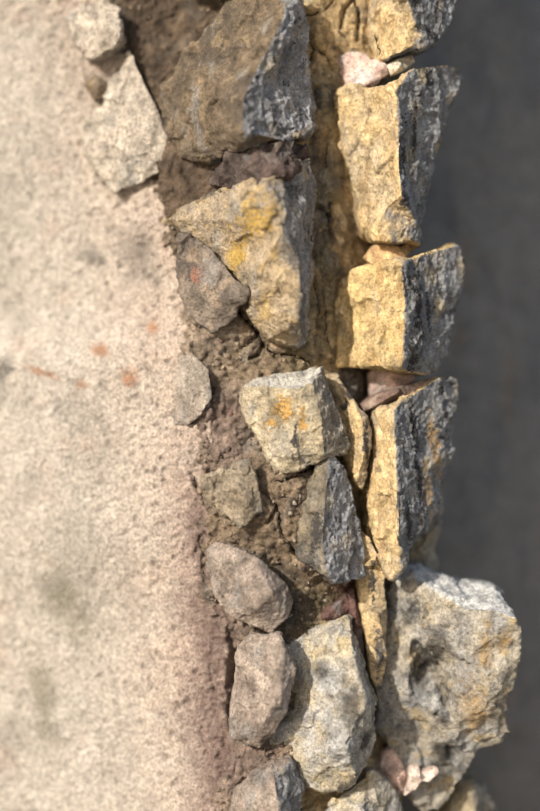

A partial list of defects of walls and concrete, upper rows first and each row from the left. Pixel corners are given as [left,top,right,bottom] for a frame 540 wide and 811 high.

crack [309,38,333,70]
crack [341,0,382,56]
crack [238,311,312,366]
crack [313,283,331,350]
crack [265,466,315,551]